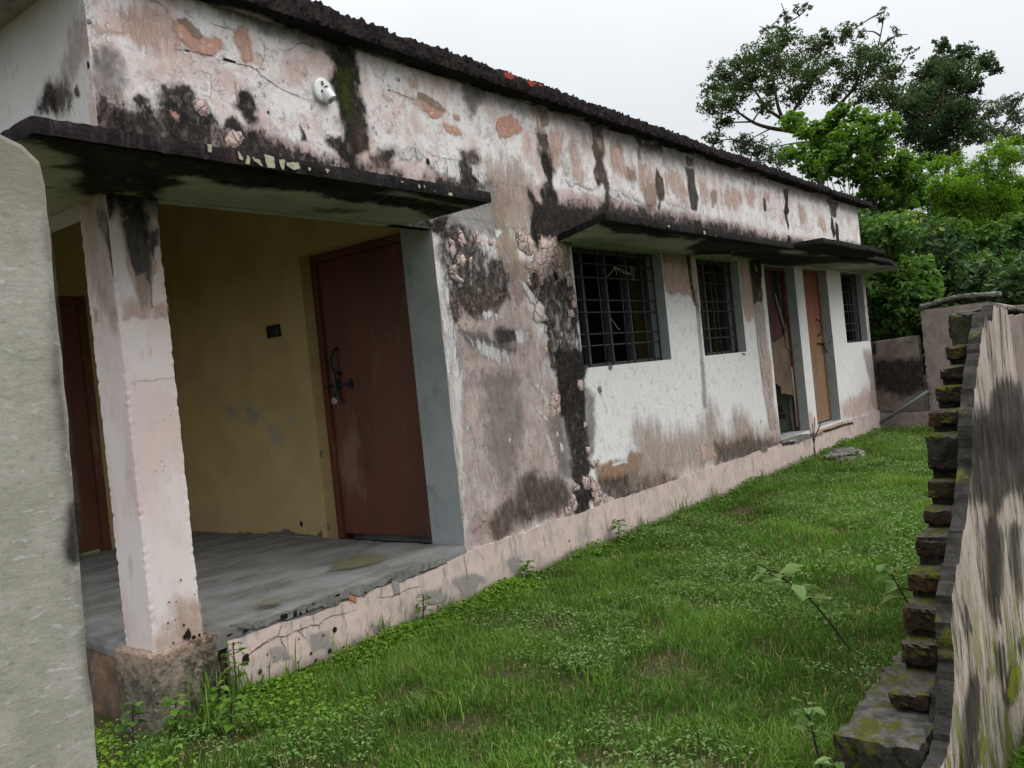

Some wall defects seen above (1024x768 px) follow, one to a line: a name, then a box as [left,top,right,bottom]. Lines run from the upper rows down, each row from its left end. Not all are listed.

peeling [172,18,252,65]
water stain [37,4,418,177]
peeling [388,78,462,136]
peeling [496,105,593,191]
peeling [494,228,529,305]
water stain [37,124,926,550]
peeling [516,327,529,347]
crack [214,588,357,683]